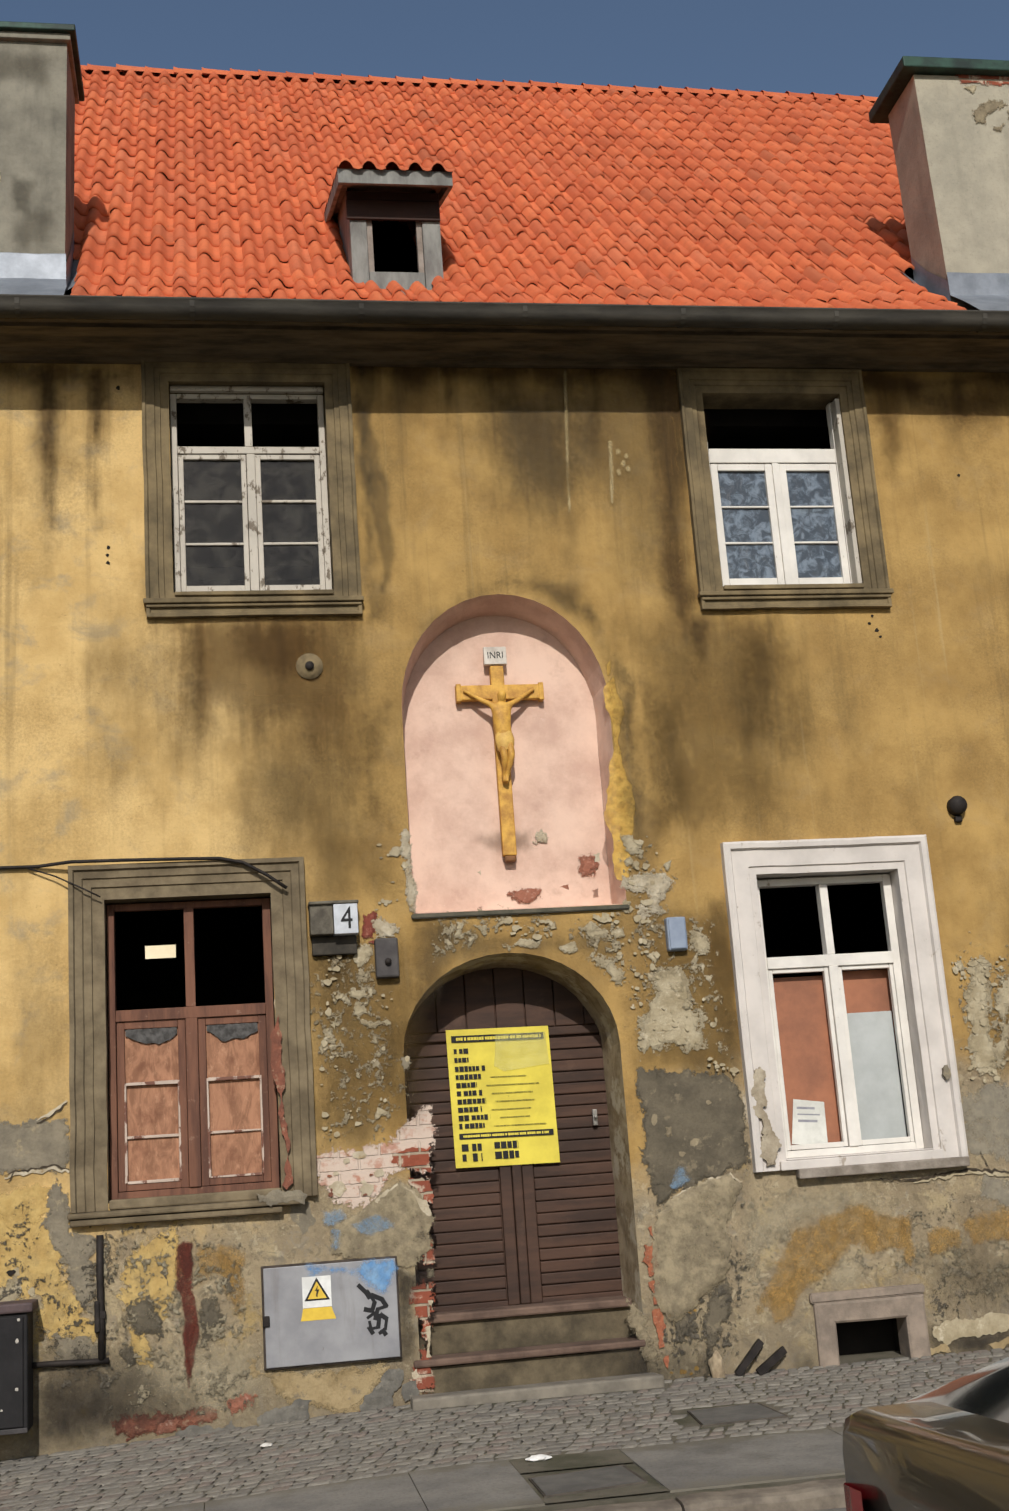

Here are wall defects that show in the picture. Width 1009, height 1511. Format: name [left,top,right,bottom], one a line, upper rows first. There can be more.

flaking render [955,74,1009,131]
water stain [0,364,116,451]
peeling [532,829,548,844]
flaking render [309,829,438,1210]
peeling [427,834,782,1171]
peeling [942,931,1009,1089]
peeling [270,1000,316,1235]
crack [872,1151,1009,1183]
flaking render [0,1177,311,1442]
peeling [642,1183,757,1375]